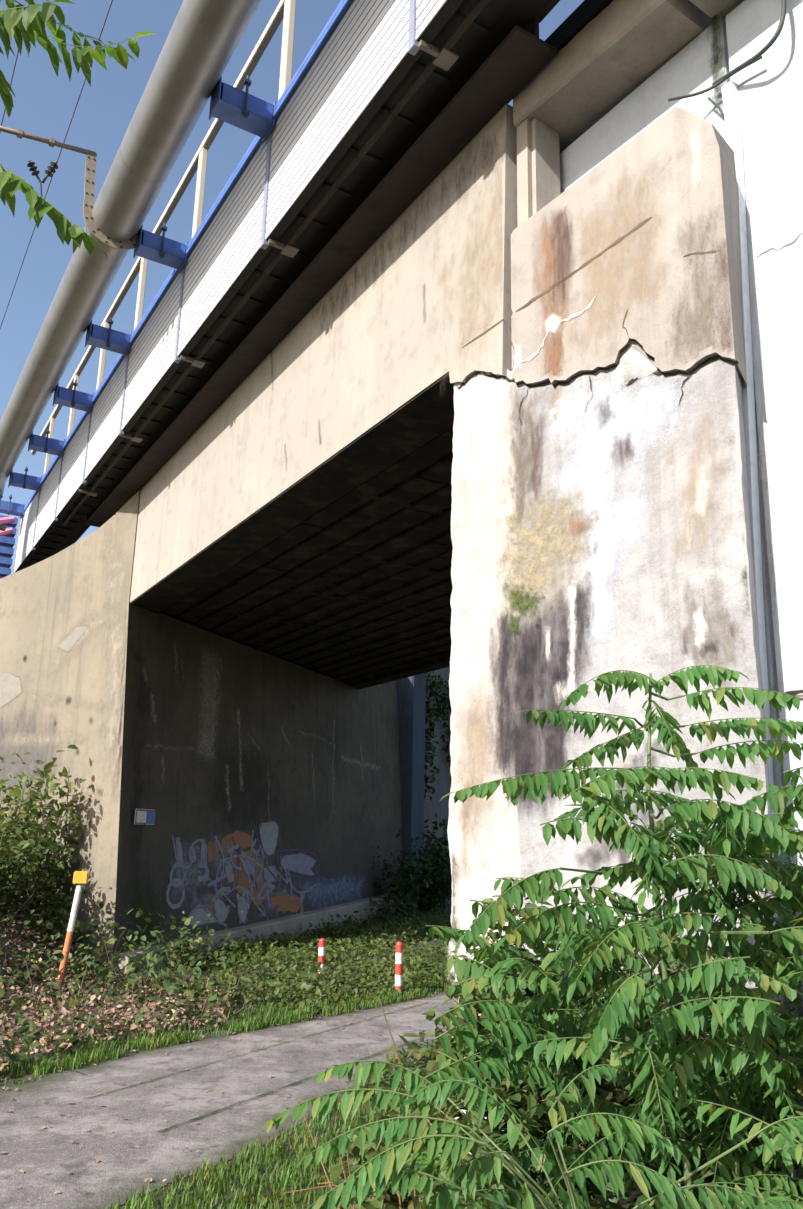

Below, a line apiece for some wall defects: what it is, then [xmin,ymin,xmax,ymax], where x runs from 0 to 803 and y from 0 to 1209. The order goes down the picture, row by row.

rust [538,214,570,324]
crack [756,232,803,258]
crack [457,309,739,433]
water stain [492,591,587,808]